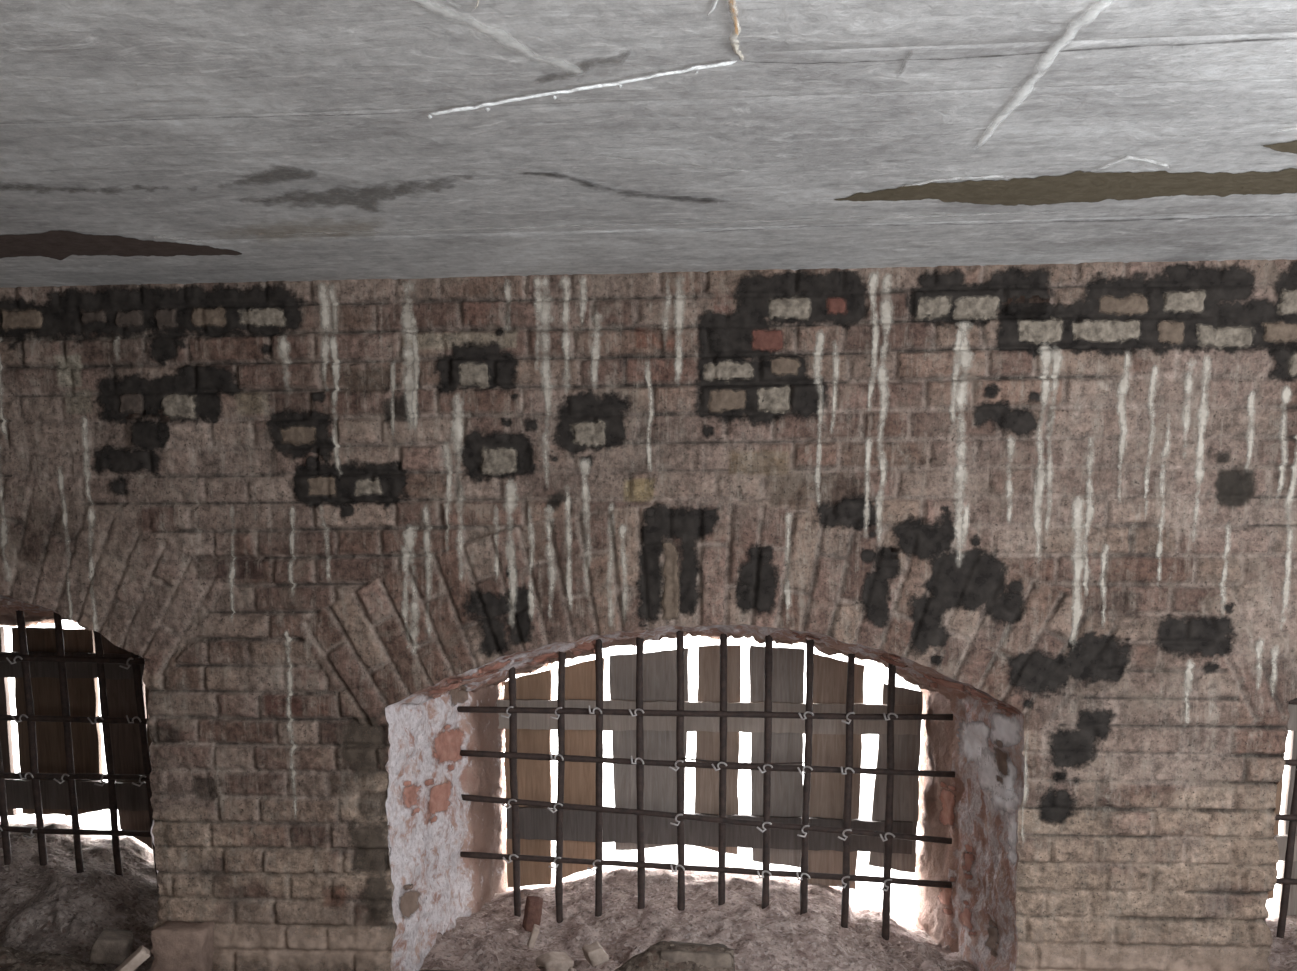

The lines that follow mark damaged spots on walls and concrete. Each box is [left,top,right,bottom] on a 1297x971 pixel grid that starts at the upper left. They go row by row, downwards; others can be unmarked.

crack [413,0,945,119]
crack [980,2,1139,144]
water stain [0,282,304,631]
water stain [266,284,409,590]
water stain [384,278,632,657]
water stain [663,262,1297,665]
water stain [608,503,719,627]
water stain [1008,438,1131,709]
peeling [428,656,512,705]
peeling [403,724,464,823]
peeling [994,740,1009,785]
water stain [979,709,1115,862]